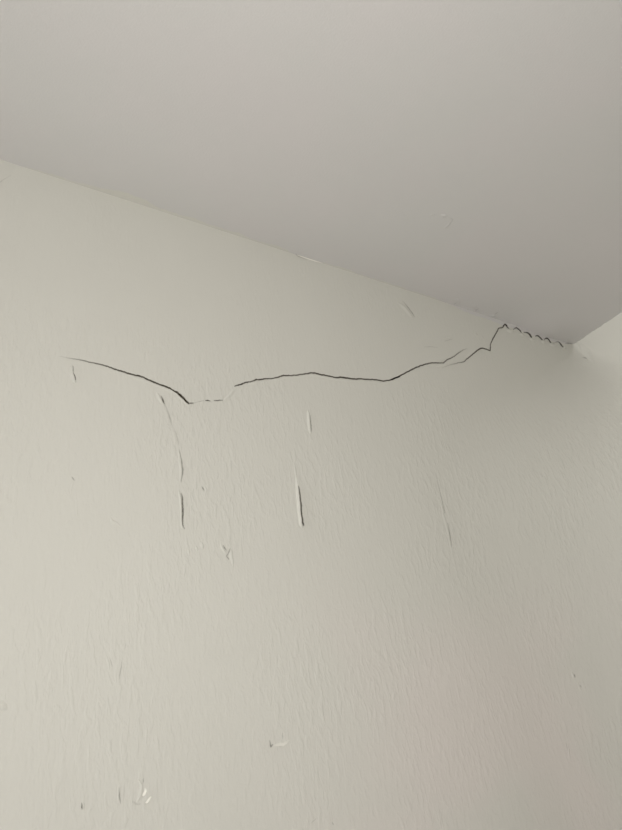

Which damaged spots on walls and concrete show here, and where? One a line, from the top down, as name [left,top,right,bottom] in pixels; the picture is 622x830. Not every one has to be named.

crack [91,324,566,407]
crack [177,447,185,529]